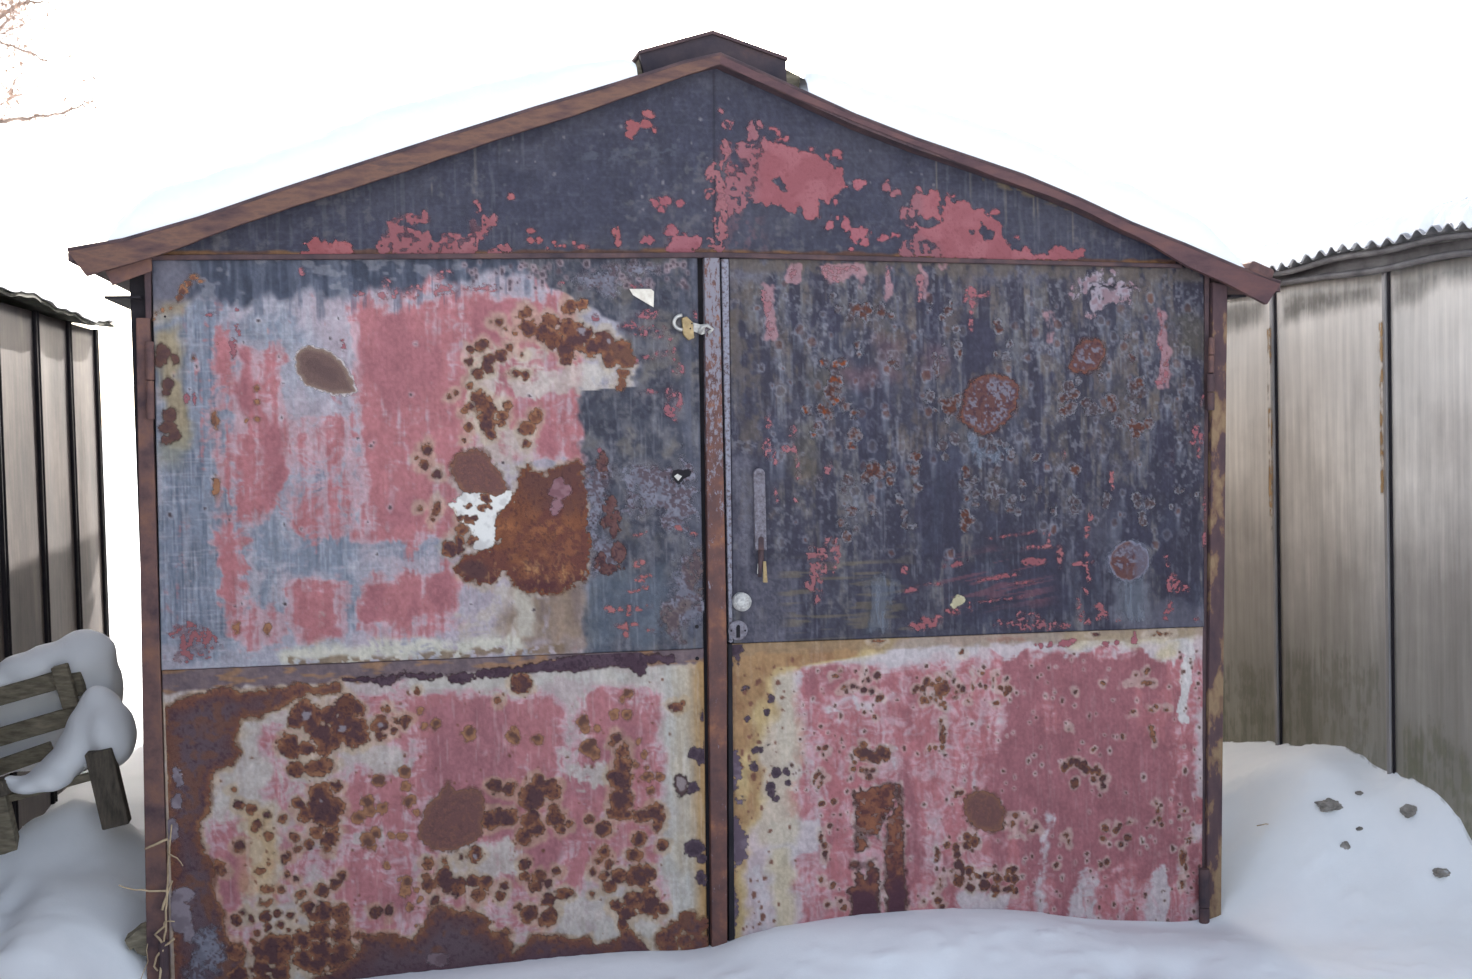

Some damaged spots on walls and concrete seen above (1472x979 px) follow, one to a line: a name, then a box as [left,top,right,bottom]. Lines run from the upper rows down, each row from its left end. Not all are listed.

peeling [625,110,656,140]
peeling [299,237,355,276]
peeling [353,200,585,300]
peeling [640,108,1138,319]
peeling [448,490,513,550]
rust [414,298,637,596]
peeling [548,477,572,516]
rust [801,292,1043,543]
rust [912,672,1012,752]
rust [165,652,709,979]
rust [749,744,791,802]
rust [813,741,1019,916]